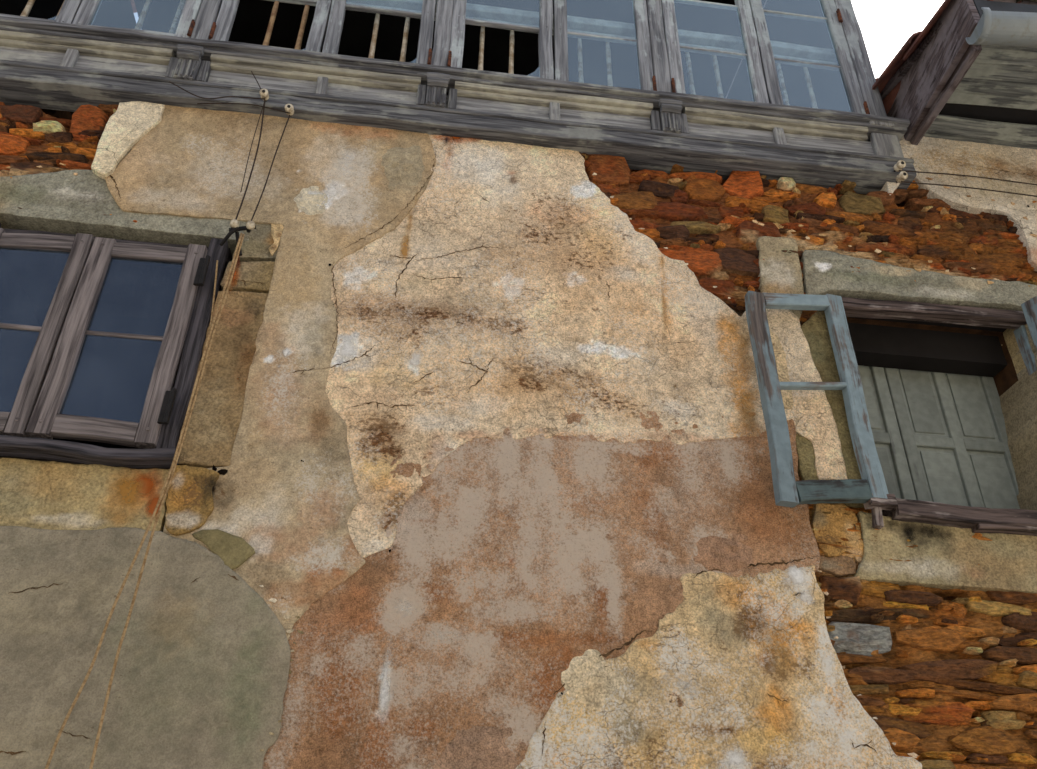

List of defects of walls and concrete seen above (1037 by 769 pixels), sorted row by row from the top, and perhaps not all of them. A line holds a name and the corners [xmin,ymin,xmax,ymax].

spalling [0,101,165,180]
crack [286,151,437,375]
crack [395,245,498,296]
spalling [579,152,1037,317]
spalling [799,310,818,326]
spalling [807,503,1037,769]